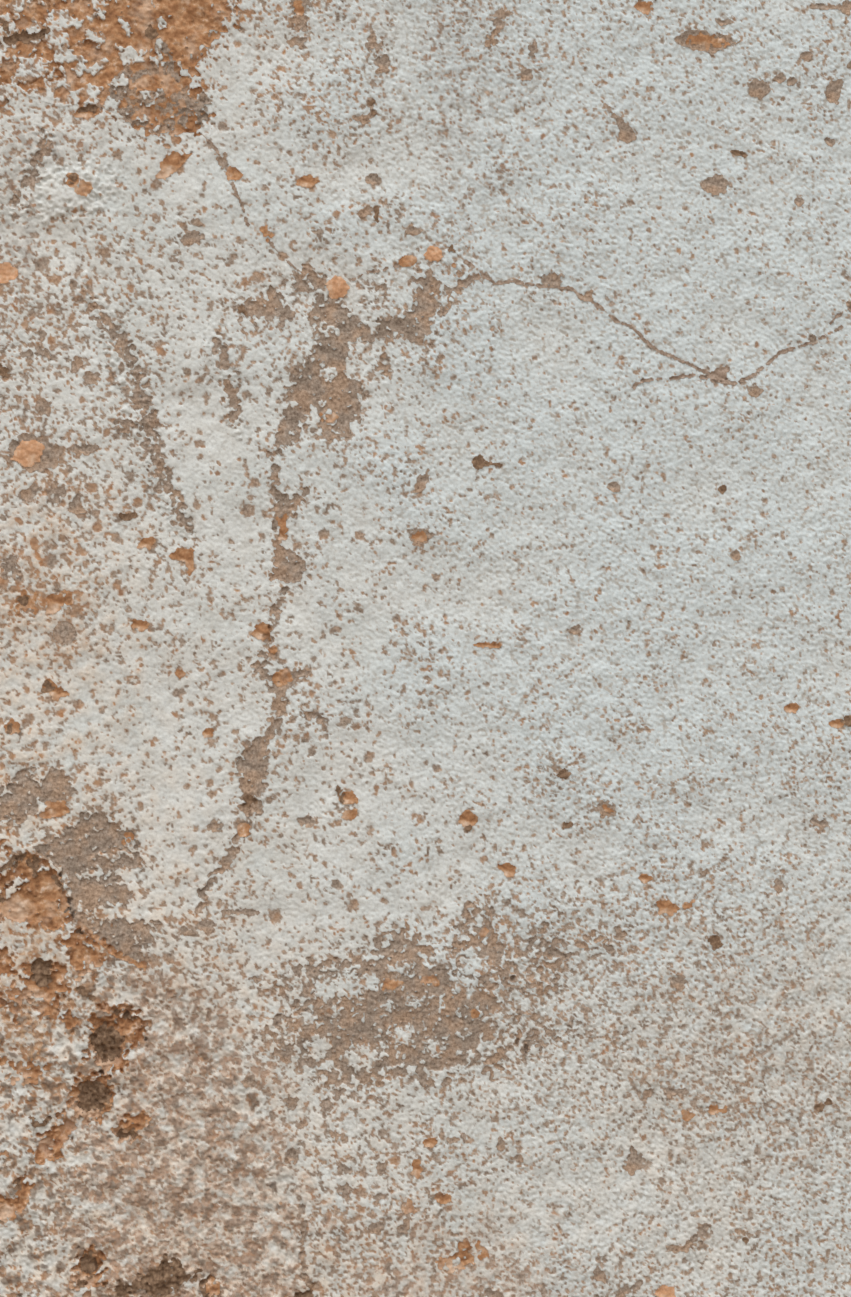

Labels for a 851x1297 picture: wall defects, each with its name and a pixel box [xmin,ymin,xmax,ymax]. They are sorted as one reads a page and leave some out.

spalling [0,0,241,180]
crack [206,139,296,270]
crack [351,263,399,281]
crack [464,259,851,390]
peeling [0,766,161,1029]
peeling [248,901,627,1113]
spalling [89,1008,137,1063]
spalling [0,1056,52,1086]
spalling [28,1115,52,1128]
spalling [77,1080,112,1112]
spalling [0,1174,36,1223]
hole [76,1250,98,1288]